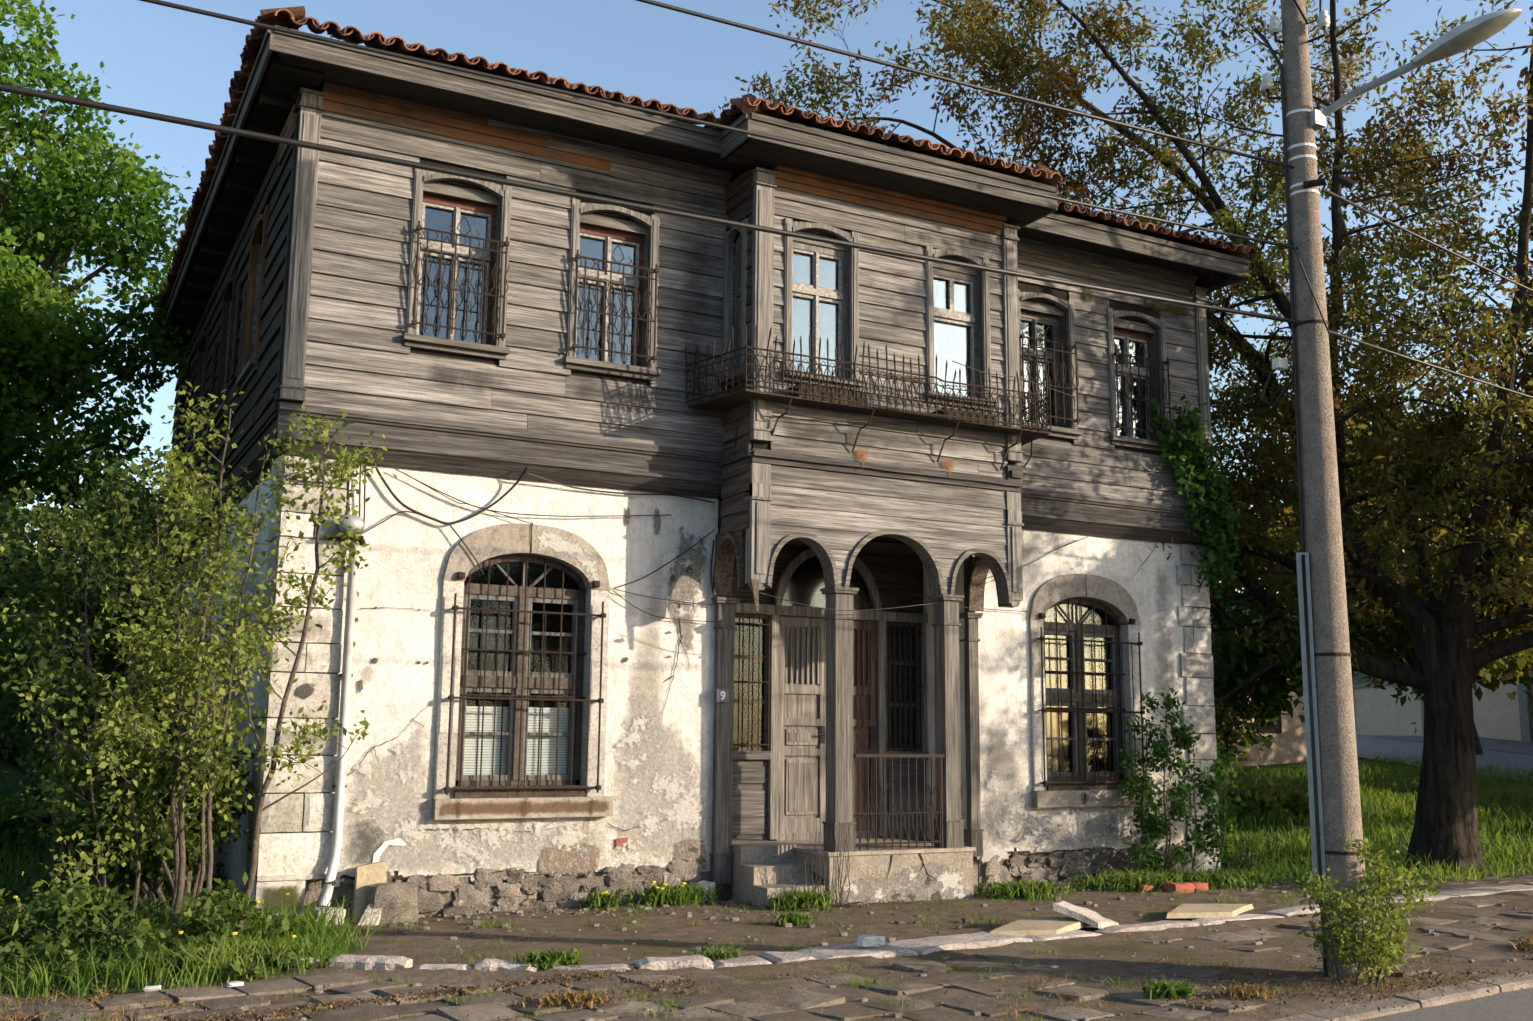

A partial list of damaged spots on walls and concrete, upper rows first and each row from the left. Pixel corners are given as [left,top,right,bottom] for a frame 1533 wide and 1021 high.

peeling [666,526,707,651]
crack [348,702,434,776]
peeling [348,695,707,875]
peeling [980,742,1181,864]
crack [887,853,937,888]